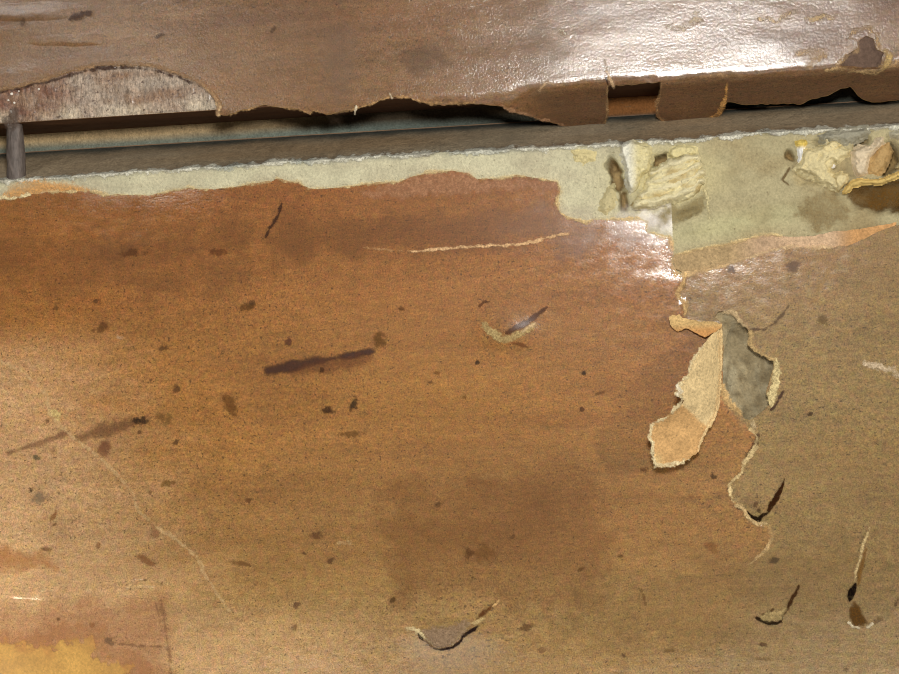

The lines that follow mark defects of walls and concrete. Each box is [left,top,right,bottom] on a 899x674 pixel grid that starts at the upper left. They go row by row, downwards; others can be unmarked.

peeling [0,61,221,124]
spalling [598,139,710,226]
spalling [782,124,899,211]
peeling [647,314,723,468]
crack [735,479,785,525]
leakage [0,624,134,674]